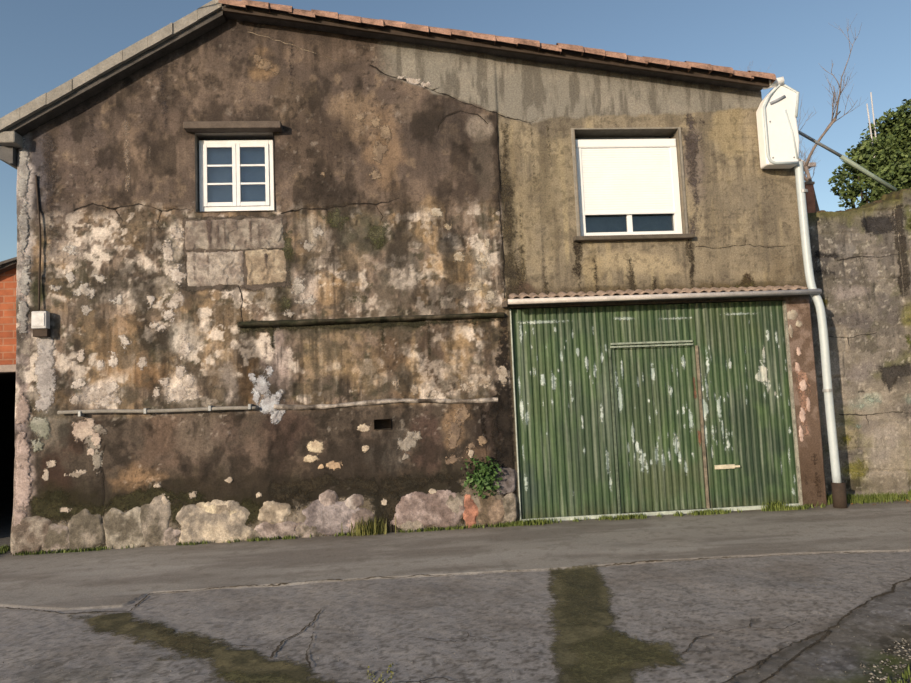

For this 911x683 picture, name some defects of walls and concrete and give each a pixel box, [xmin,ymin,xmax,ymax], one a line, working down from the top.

peeling [49,271,107,316]
spalling [149,214,315,332]
crack [370,65,533,298]
water stain [572,242,583,286]
water stain [574,260,656,297]
water stain [681,114,714,293]
water stain [861,205,910,295]
spalling [10,334,529,555]
peeling [627,346,733,473]
peeling [746,330,790,406]
peeling [780,347,811,442]
water stain [878,363,911,391]